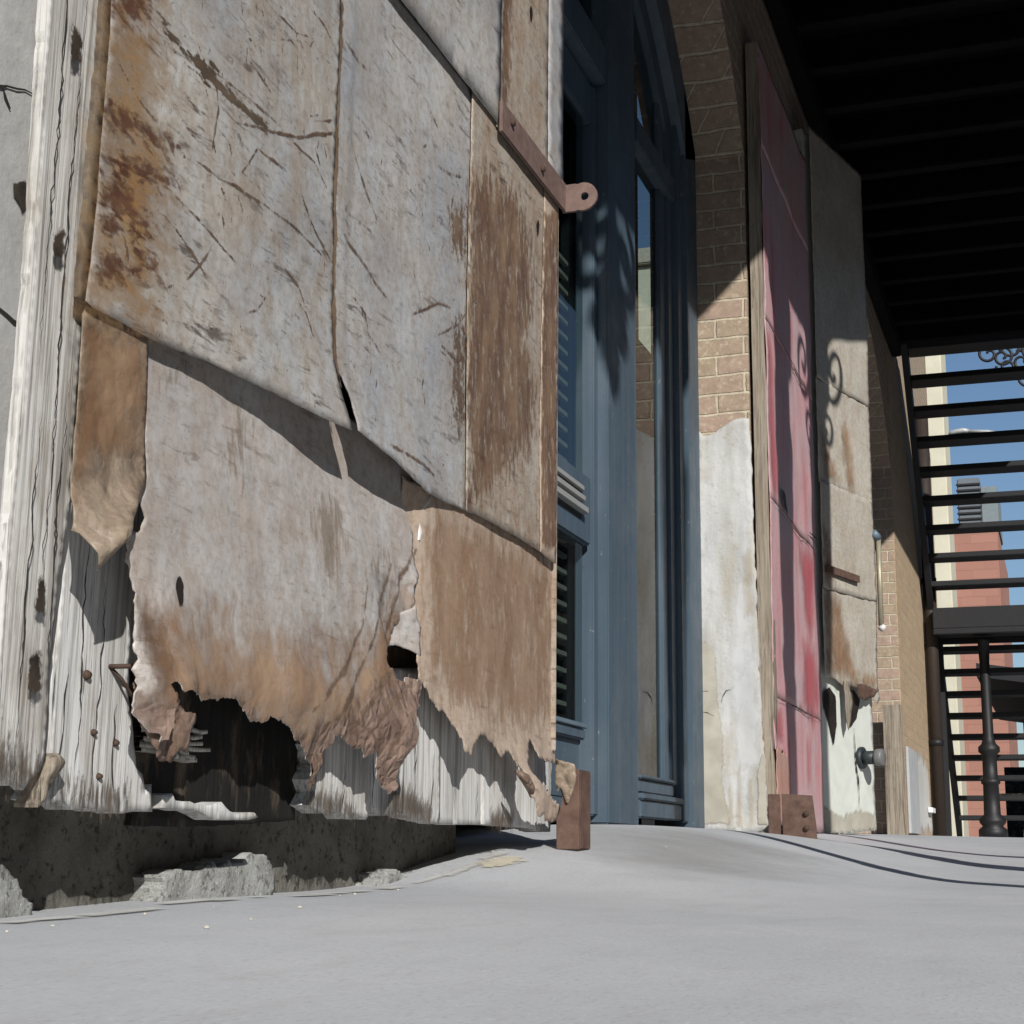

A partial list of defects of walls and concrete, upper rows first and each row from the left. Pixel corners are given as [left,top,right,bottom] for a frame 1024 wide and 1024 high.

rust [90,0,269,314]
crack [0,0,117,796]
rust [447,169,558,547]